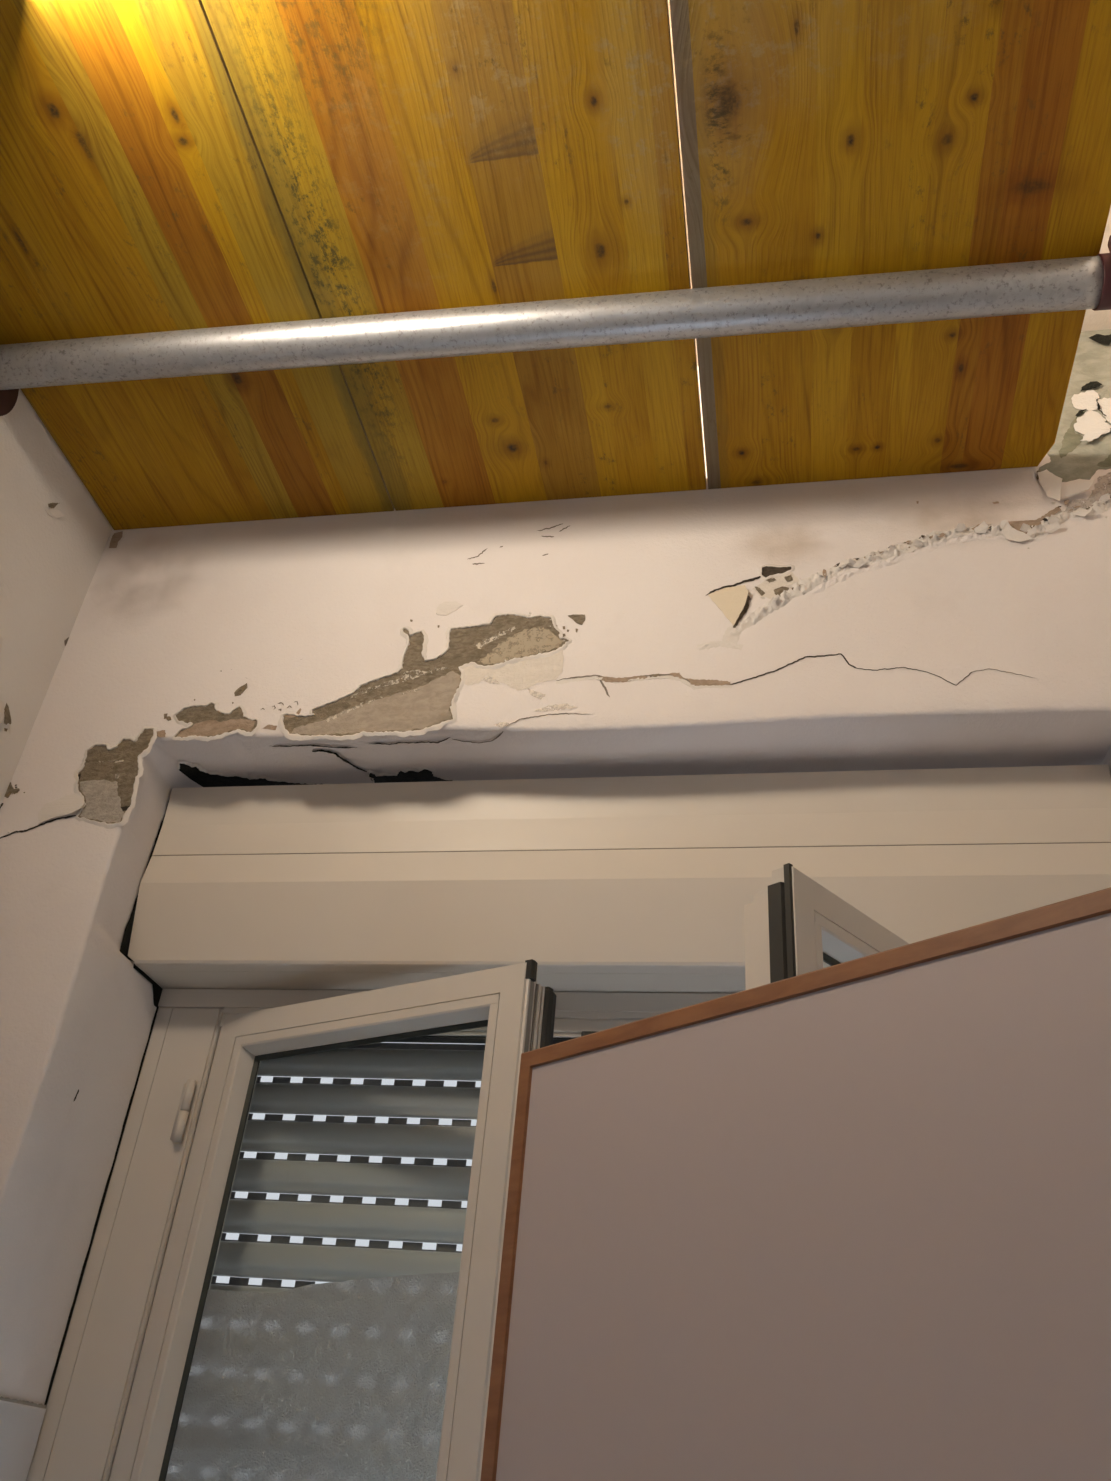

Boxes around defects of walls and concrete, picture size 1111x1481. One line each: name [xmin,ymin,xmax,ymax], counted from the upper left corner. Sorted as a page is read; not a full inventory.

peeling [1039,329,1111,482]
peeling [707,564,802,628]
spalling [73,612,585,829]
crack [273,653,1032,781]
crack [0,793,84,839]